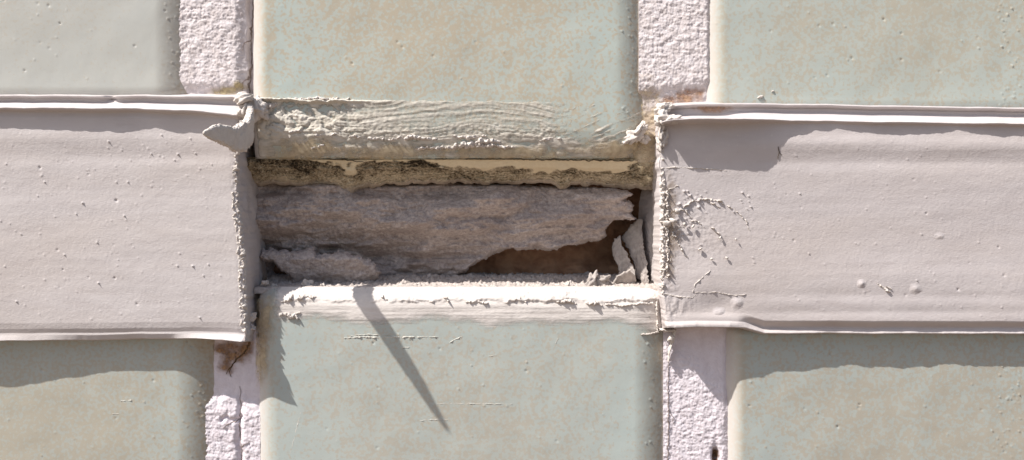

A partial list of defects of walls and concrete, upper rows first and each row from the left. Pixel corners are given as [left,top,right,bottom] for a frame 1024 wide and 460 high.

peeling [288,129,514,151]